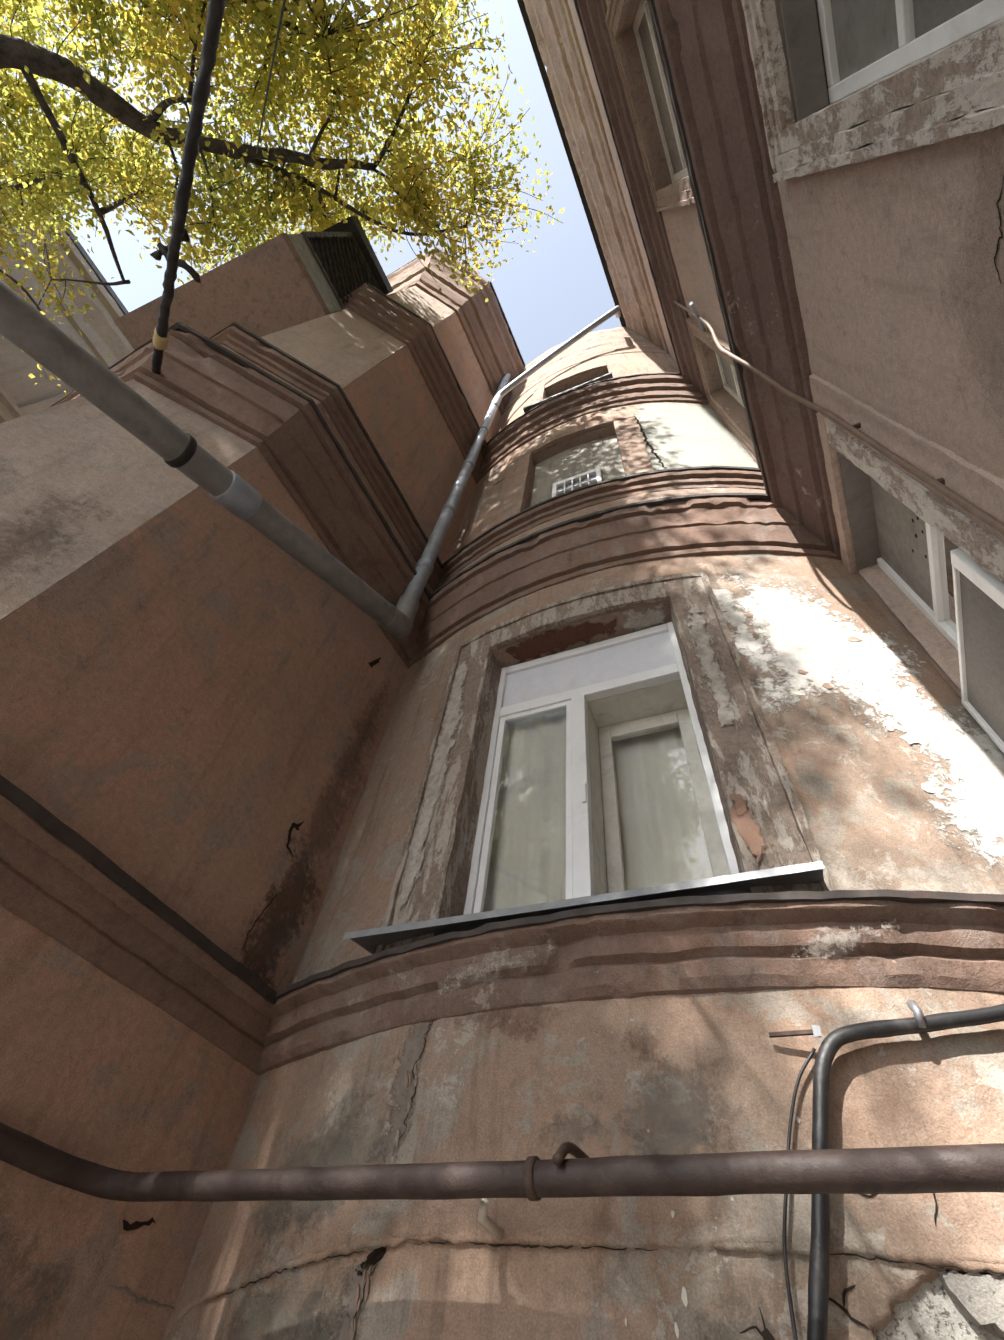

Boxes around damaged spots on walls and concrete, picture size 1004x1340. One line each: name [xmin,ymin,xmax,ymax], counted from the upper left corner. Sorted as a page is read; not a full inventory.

peeling [505,602,668,663]
peeling [686,567,1004,876]
peeling [399,661,468,912]
crack [931,1193,939,1225]
crack [739,1307,775,1340]
crack [829,1285,870,1330]
spalling [873,1270,1004,1340]